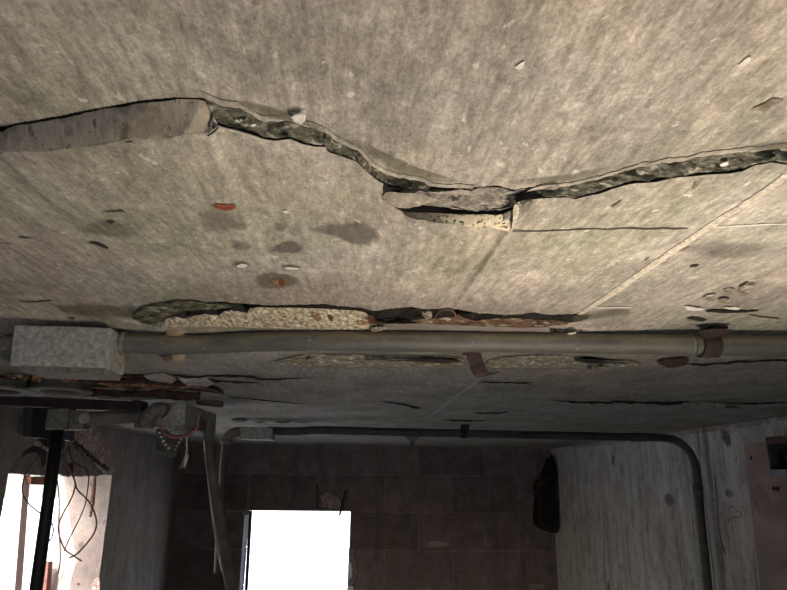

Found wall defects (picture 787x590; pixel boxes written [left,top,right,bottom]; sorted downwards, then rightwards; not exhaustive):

spalling [0,99,219,152]
crack [0,92,787,215]
spalling [402,204,519,231]
crack [513,226,688,234]
crack [713,222,781,230]
spalling [68,301,632,333]
spalling [271,353,466,368]
spalling [486,355,641,371]
crack [676,359,787,369]
crack [166,373,310,405]
crack [377,401,420,409]
crack [550,399,692,407]